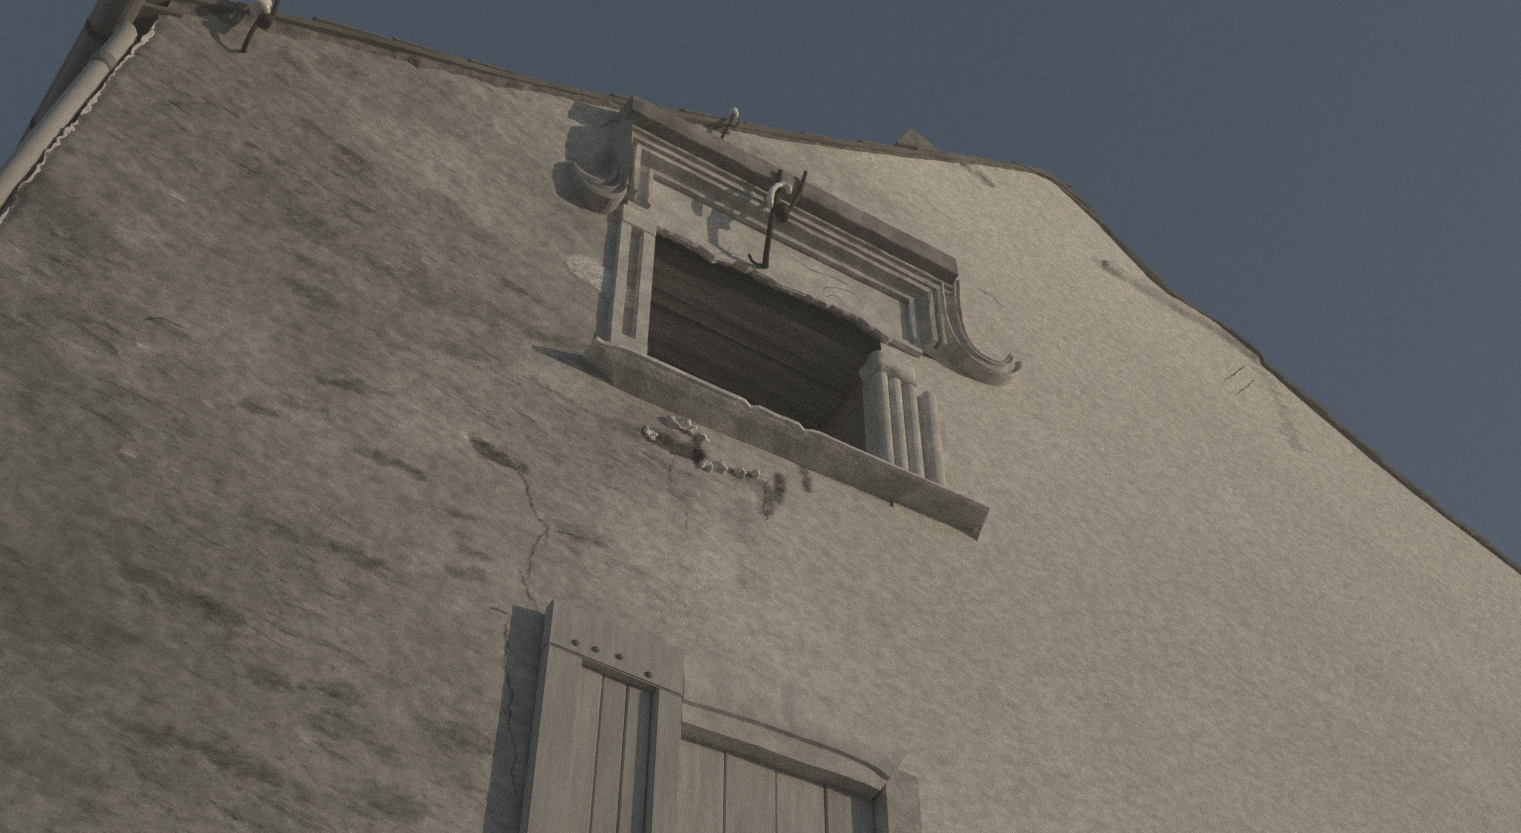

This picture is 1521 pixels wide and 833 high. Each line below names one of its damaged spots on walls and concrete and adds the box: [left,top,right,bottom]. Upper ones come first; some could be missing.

spalling [641,415,760,480]